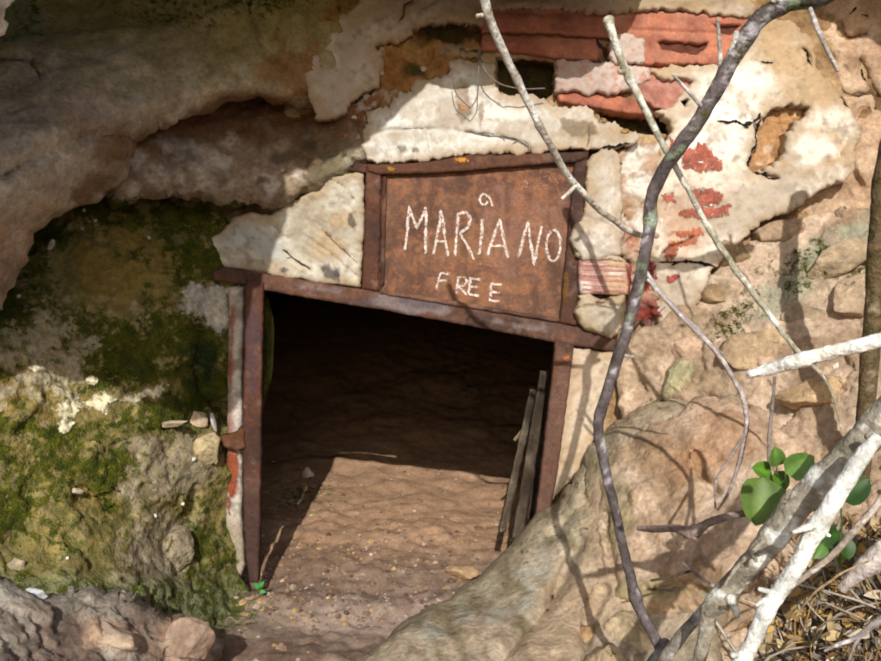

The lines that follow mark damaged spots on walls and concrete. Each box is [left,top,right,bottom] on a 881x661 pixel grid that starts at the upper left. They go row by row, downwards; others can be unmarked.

spalling [497,61,555,100]
flaking render [682,140,723,173]
crack [717,113,779,180]
flaking render [749,106,804,172]
flaking render [643,188,734,294]
flaking render [577,260,632,296]
crack [660,259,715,267]
flaking render [636,305,662,320]
rust [226,454,238,515]